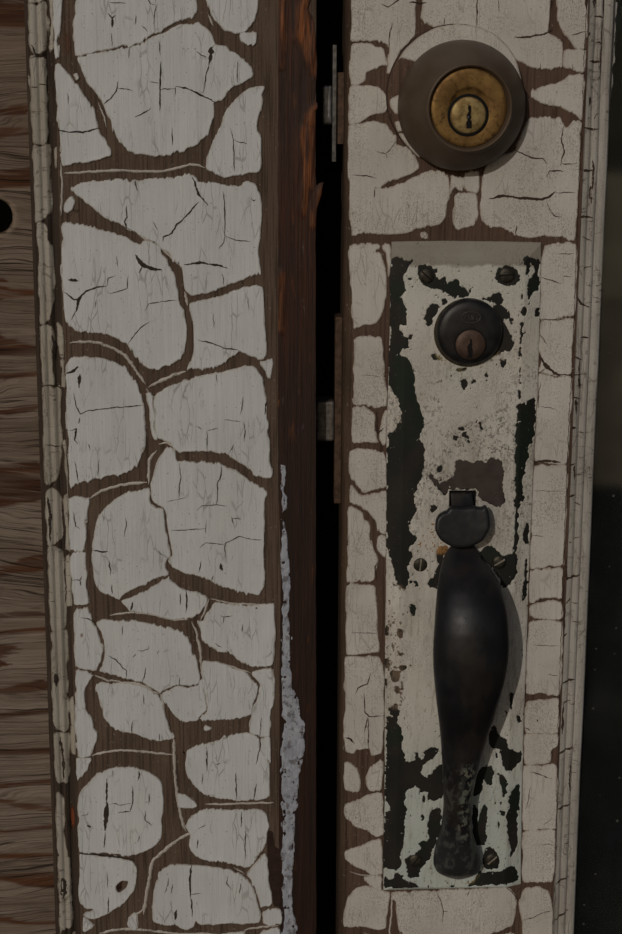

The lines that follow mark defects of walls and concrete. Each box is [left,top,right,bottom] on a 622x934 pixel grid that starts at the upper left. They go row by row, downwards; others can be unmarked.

crack [29,0,279,934]
peeling [28,0,305,934]
peeling [343,0,588,934]
crack [345,0,604,934]